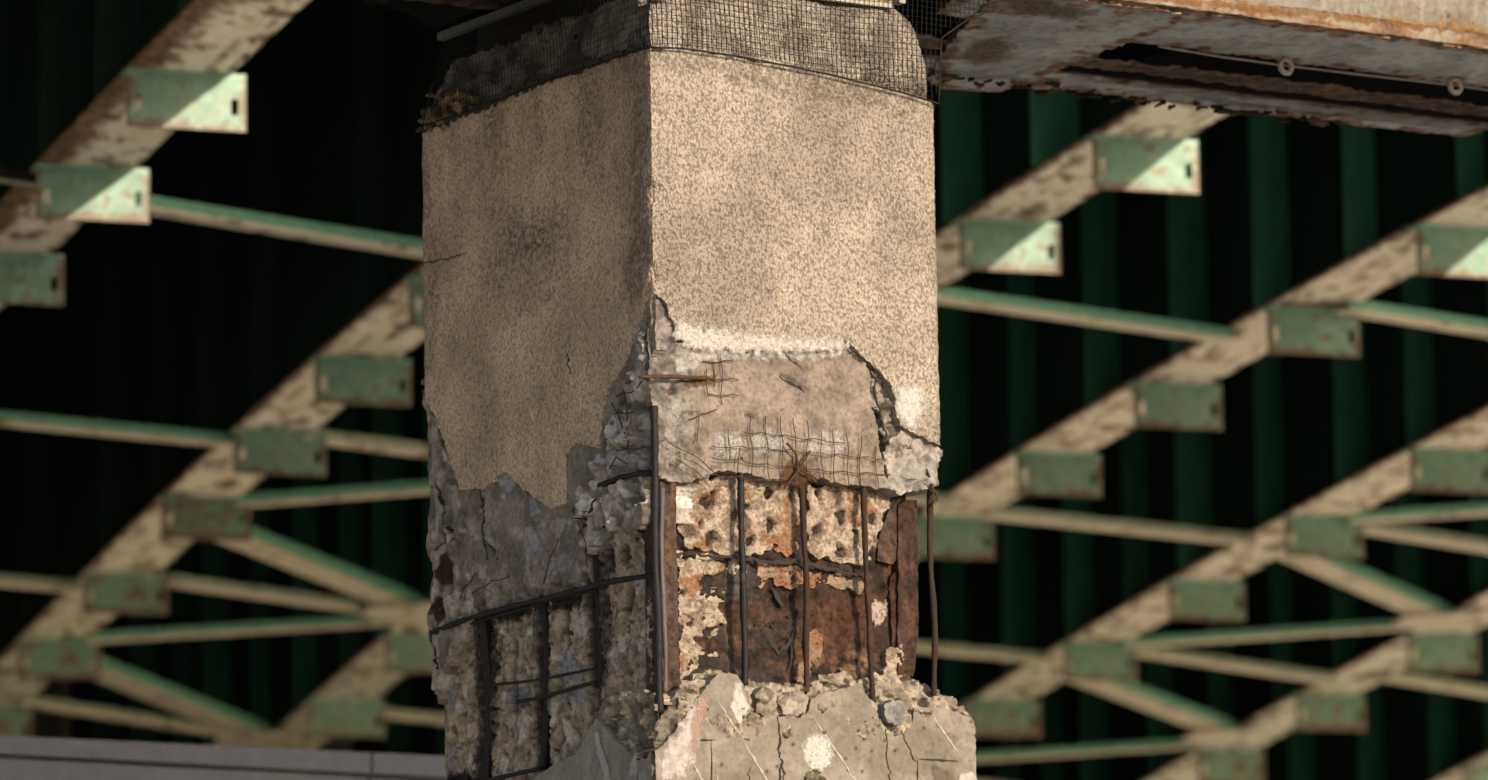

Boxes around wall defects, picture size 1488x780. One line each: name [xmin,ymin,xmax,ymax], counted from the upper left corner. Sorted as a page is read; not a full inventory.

rust [1005,0,1095,20]
rust [1164,0,1488,34]
spalling [421,294,975,780]
crack [747,716,786,780]
crack [885,729,918,780]